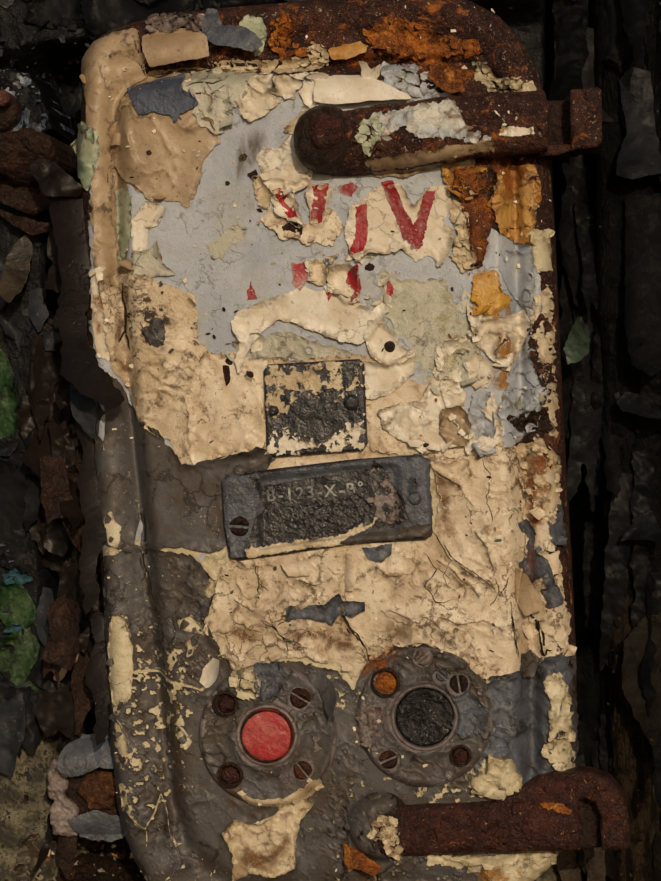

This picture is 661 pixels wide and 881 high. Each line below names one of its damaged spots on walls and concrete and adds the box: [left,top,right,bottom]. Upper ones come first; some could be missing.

corrosion [268,13,309,61]
corrosion [340,16,483,80]
peeling [494,110,535,137]
peeling [602,0,661,182]
corrosion [450,162,527,267]
peeling [0,0,495,776]
peeling [177,163,585,801]
peeling [558,155,661,810]
crack [424,535,545,657]
peeling [223,778,324,880]
peeling [342,790,404,878]
corrosion [539,802,572,815]